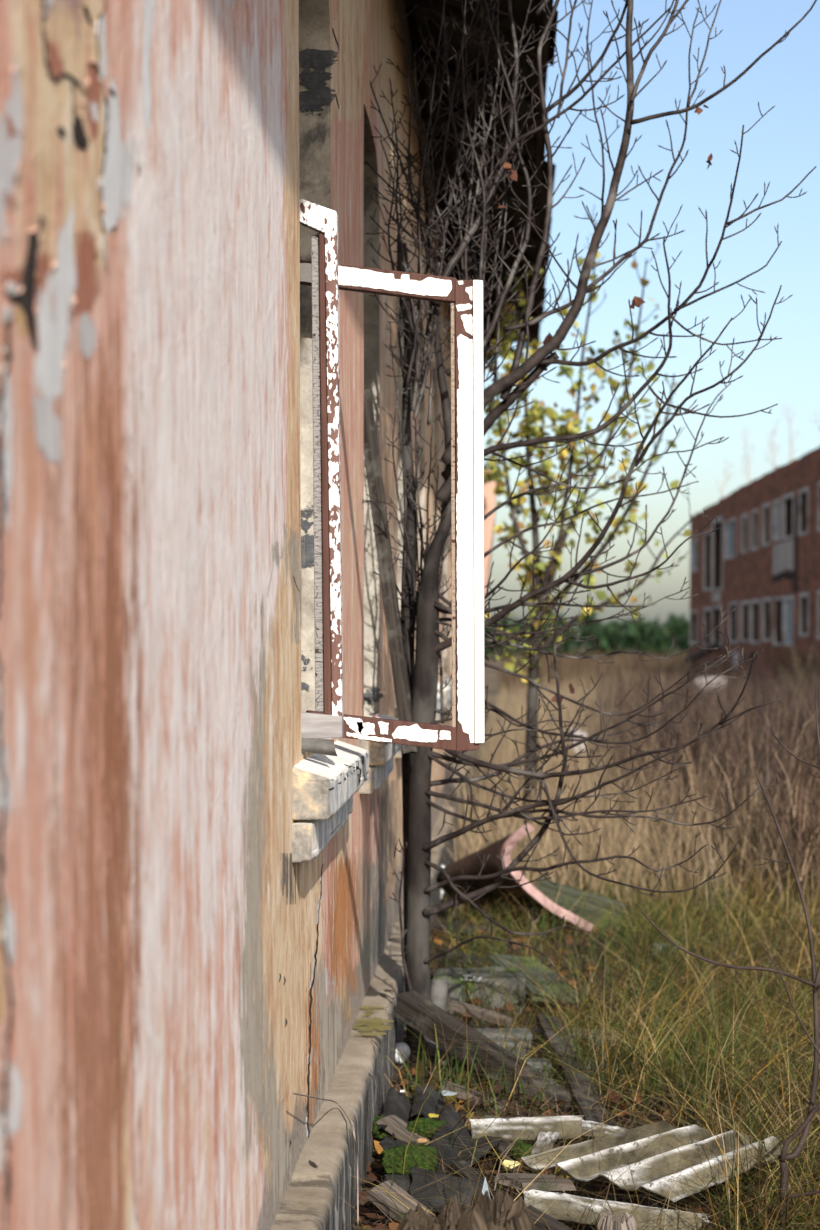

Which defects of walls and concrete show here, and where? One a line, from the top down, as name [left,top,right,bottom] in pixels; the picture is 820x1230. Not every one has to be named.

crack [0,317,13,602]
peeling [0,0,155,468]
peeling [338,266,475,743]
crack [0,663,23,1230]
crack [305,864,323,1167]